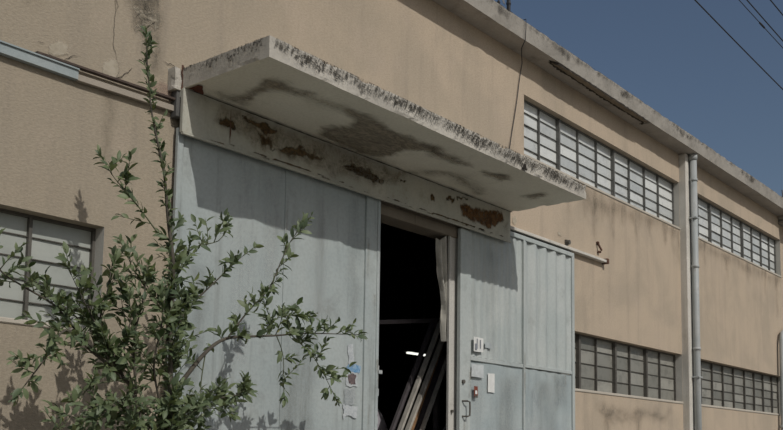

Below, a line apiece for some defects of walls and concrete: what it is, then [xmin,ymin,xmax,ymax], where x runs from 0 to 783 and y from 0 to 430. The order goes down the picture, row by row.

leakage [238,80,306,100]
corrosion [212,117,236,146]
corrosion [242,115,329,180]
leakage [322,110,466,171]
corrosion [345,163,384,184]
corrosion [409,196,504,237]